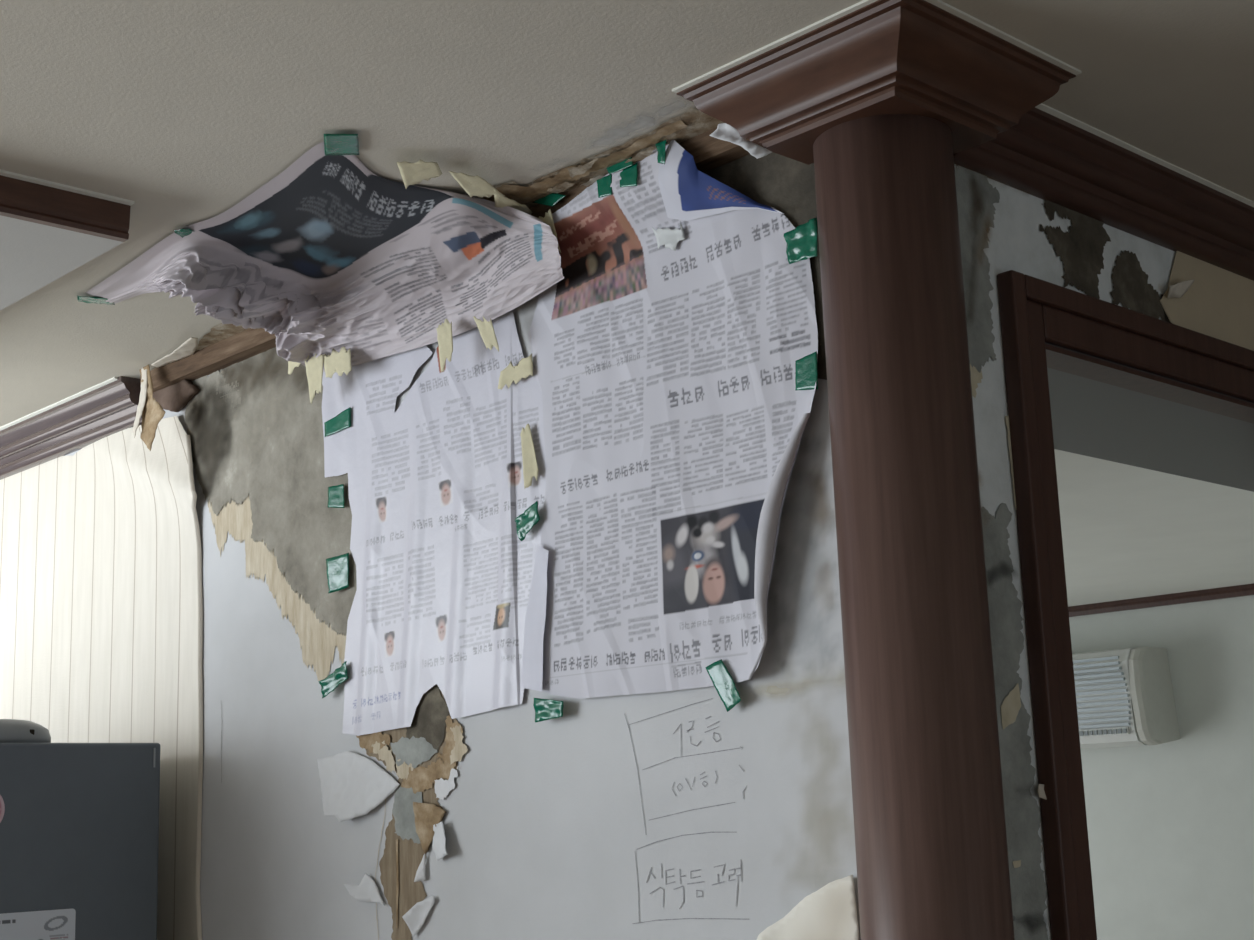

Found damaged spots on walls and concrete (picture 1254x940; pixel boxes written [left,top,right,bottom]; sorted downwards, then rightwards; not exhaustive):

spalling [954,164,1000,398]
spalling [1040,200,1167,322]
spalling [185,347,357,681]
spalling [392,786,422,844]
spalling [406,685,449,751]
spalling [981,503,1049,940]